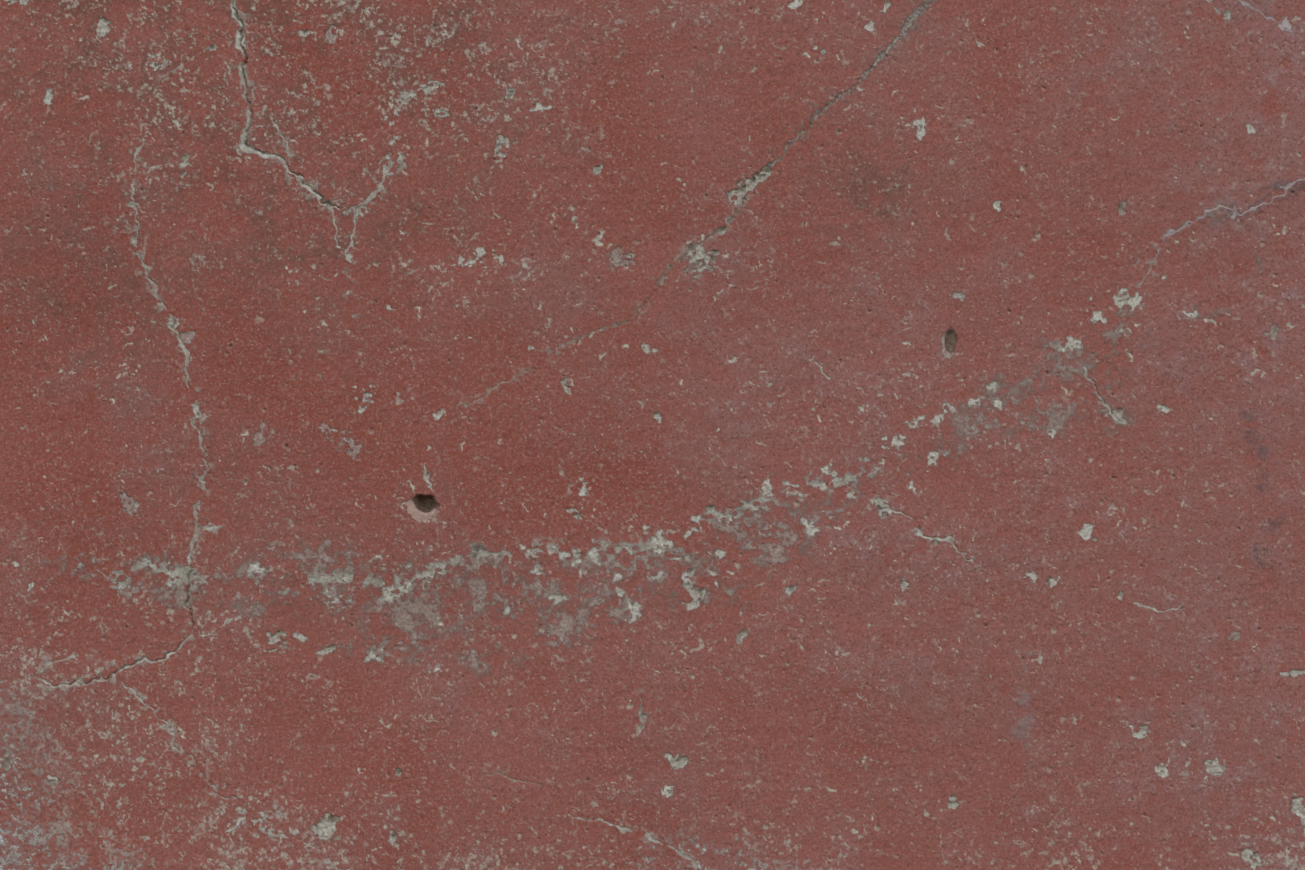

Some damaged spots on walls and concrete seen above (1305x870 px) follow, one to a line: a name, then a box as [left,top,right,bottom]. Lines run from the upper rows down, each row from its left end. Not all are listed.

crack [230,0,450,317]
crack [658,0,936,283]
crack [39,138,218,753]
flaking render [318,423,362,459]
flaking render [355,385,376,413]
peeling [881,288,1146,466]
peeling [109,553,220,609]
peeling [232,457,879,673]
flaking render [1023,571,1061,588]
flaking render [1079,523,1097,542]
crack [212,785,338,870]